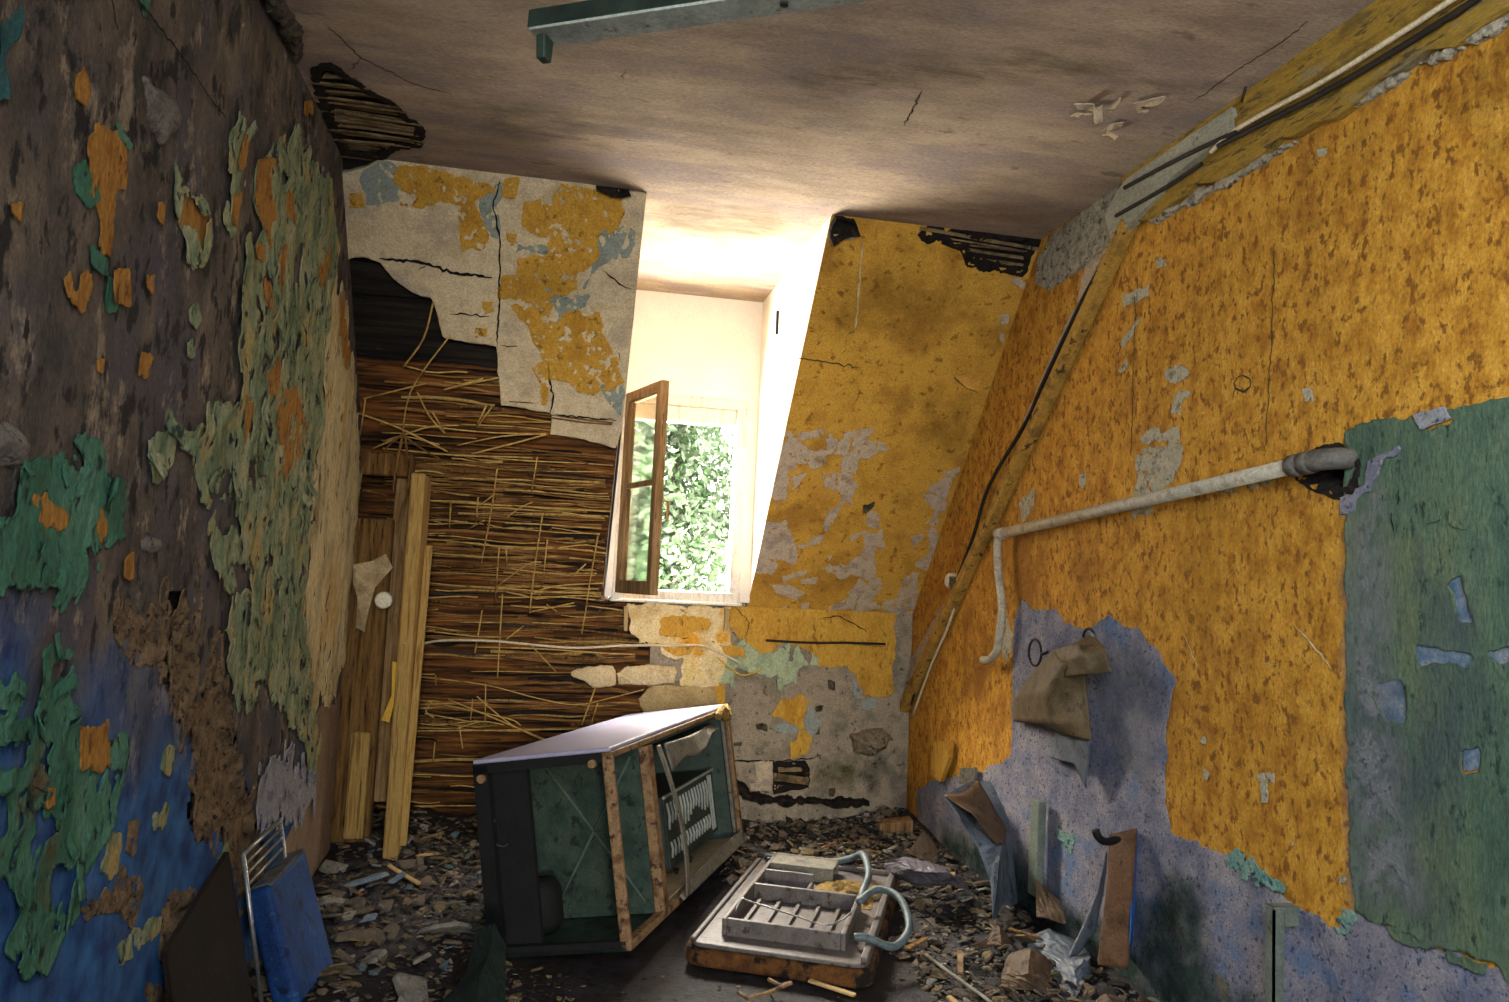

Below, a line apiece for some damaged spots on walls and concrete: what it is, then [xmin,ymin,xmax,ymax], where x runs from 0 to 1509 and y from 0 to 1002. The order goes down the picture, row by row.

crack [379,178,515,347]
peeling [475,301,494,338]
spalling [596,185,631,198]
spalling [829,215,861,246]
flaking render [911,185,1121,423]
peeling [1070,96,1166,140]
peeling [0,0,426,981]
peeling [755,427,960,615]
flaking render [1132,365,1190,519]
peeling [720,638,876,736]
peeling [917,397,1509,1002]
spalling [737,760,870,809]